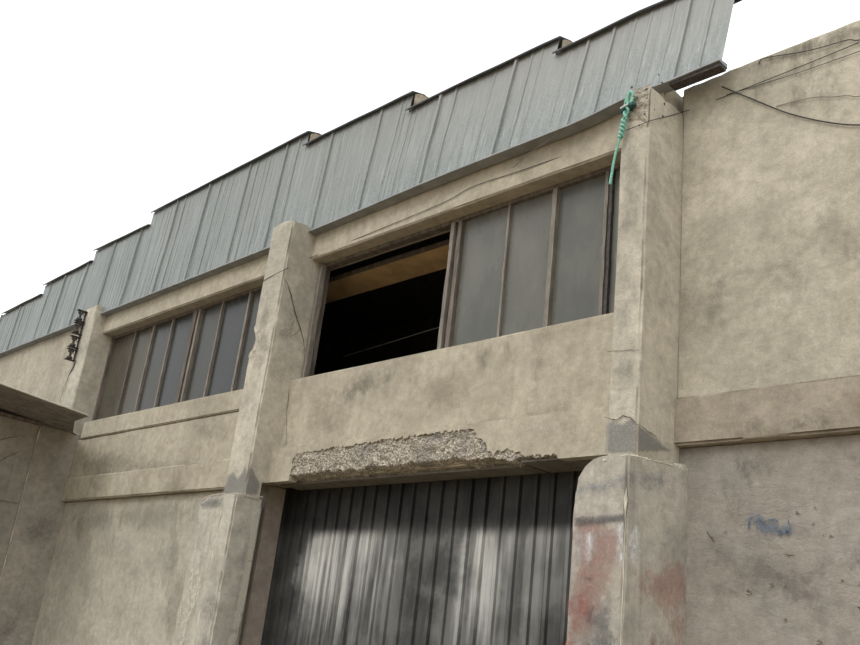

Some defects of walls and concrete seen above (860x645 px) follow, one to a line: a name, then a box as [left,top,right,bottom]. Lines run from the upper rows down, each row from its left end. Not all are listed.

spalling [623,74,665,126]
spalling [291,429,557,482]